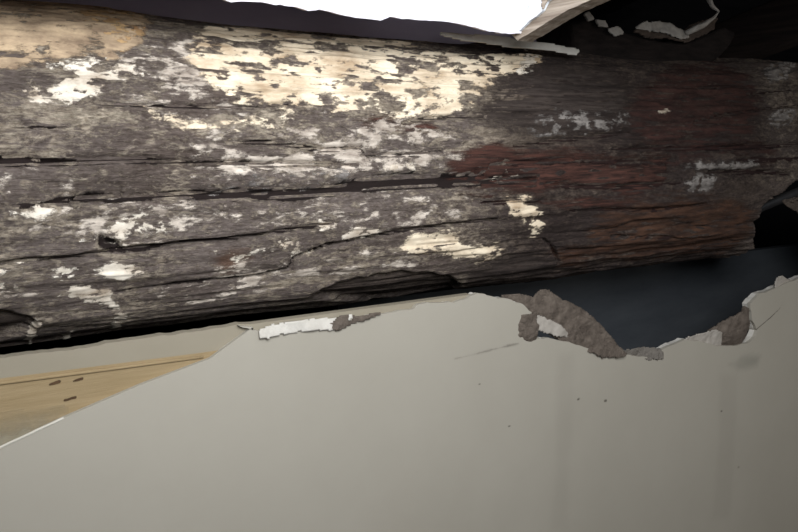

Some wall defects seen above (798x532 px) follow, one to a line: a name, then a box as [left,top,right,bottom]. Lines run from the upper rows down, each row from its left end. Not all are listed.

peeling [0,0,542,196]
crack [401,116,483,125]
peeling [13,201,73,239]
peeling [65,199,242,246]
crack [0,132,798,272]
spalling [298,190,503,300]
peeling [506,195,545,238]
peeling [53,261,144,329]
crack [162,276,236,286]
flaking render [258,312,381,339]
flaking render [501,289,664,361]
flaking render [685,306,750,346]